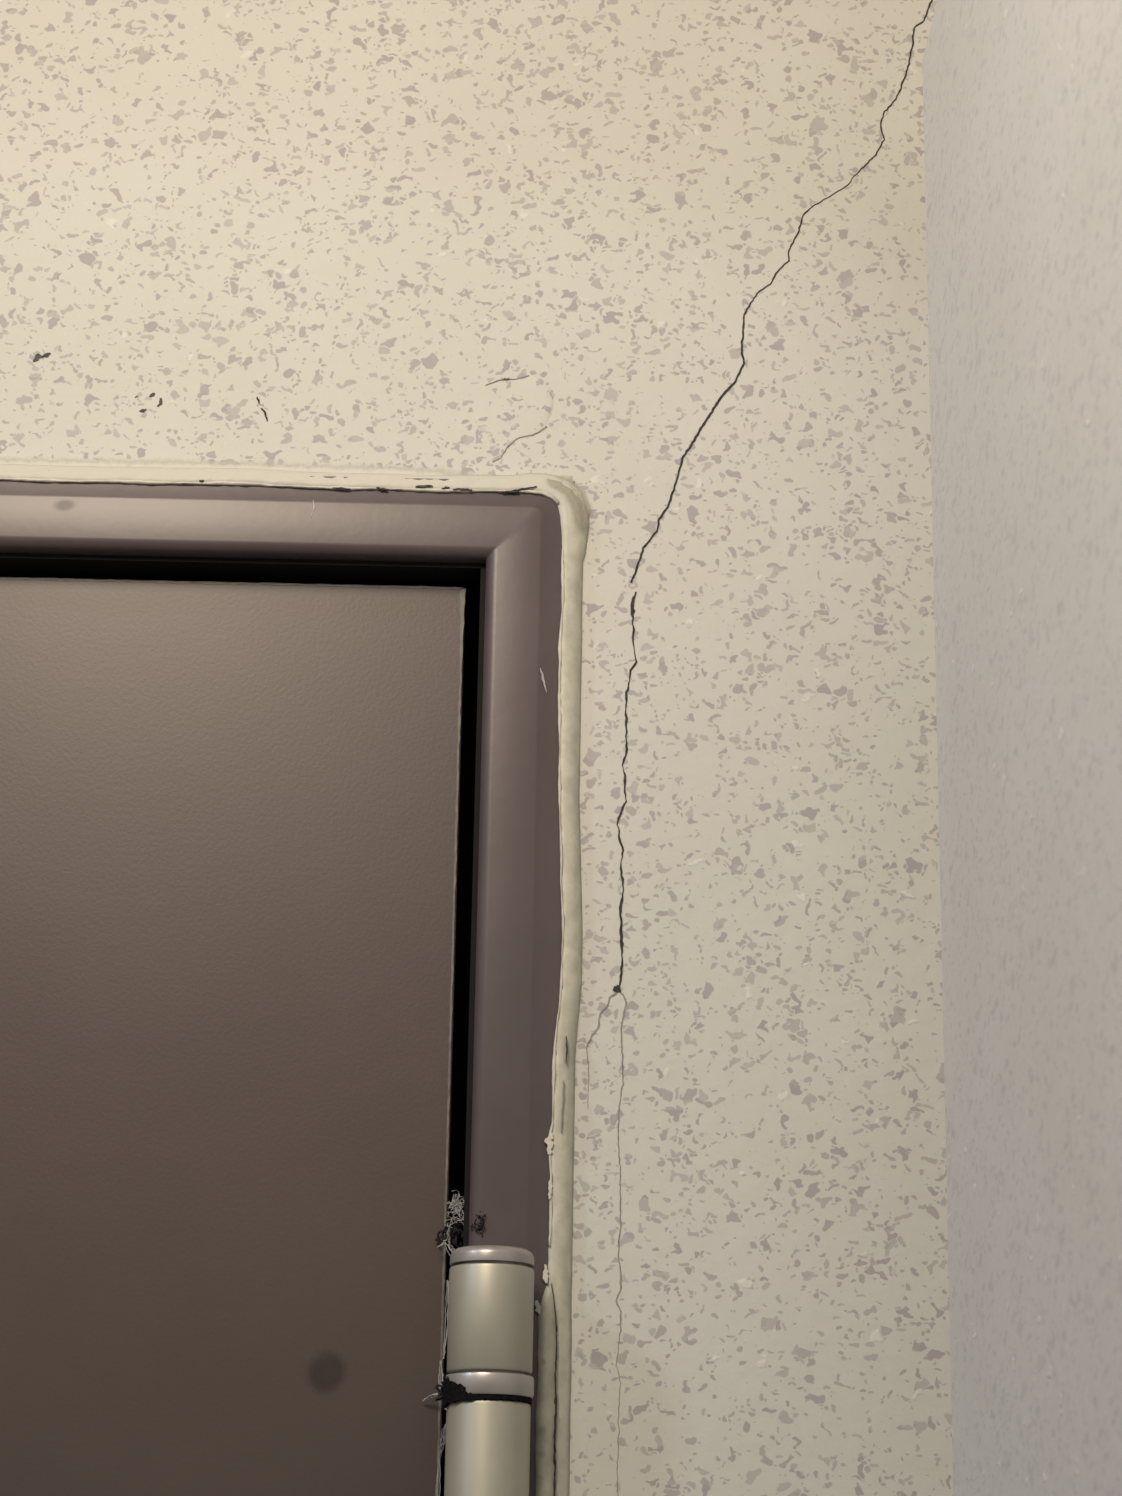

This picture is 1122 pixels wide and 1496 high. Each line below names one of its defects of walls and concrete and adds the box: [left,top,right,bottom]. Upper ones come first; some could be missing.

crack [550,1283,558,1496]
crack [561,0,933,1492]